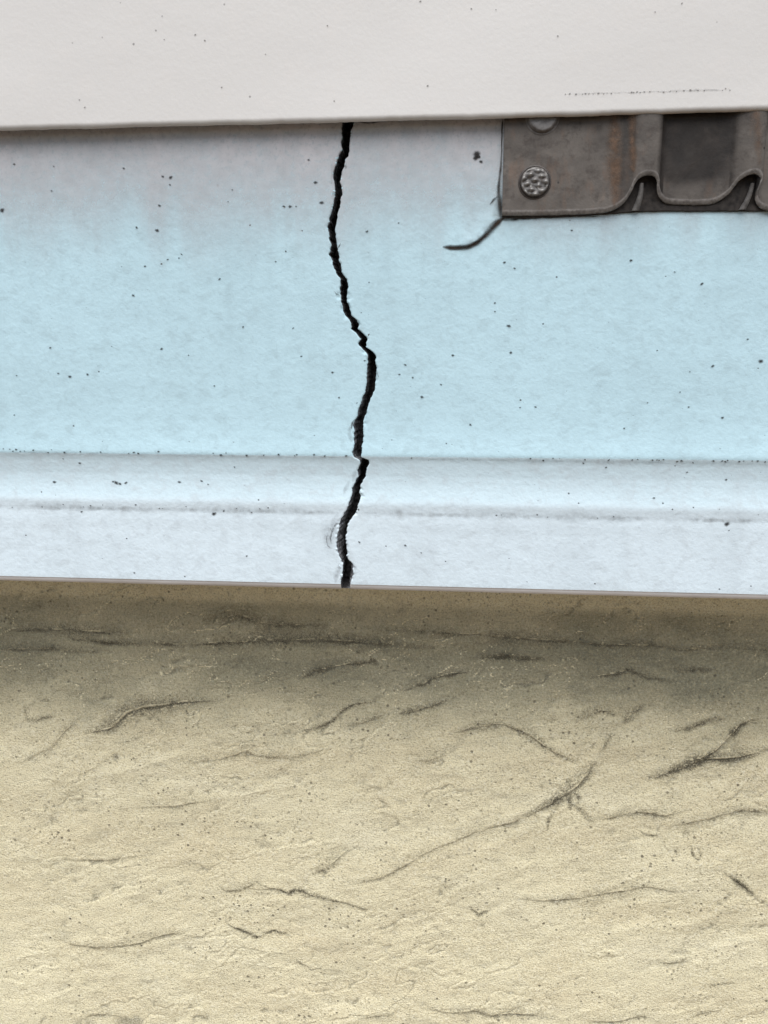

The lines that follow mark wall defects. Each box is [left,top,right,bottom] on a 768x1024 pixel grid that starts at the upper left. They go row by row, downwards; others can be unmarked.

crack [328,121,380,588]
crack [444,121,595,250]